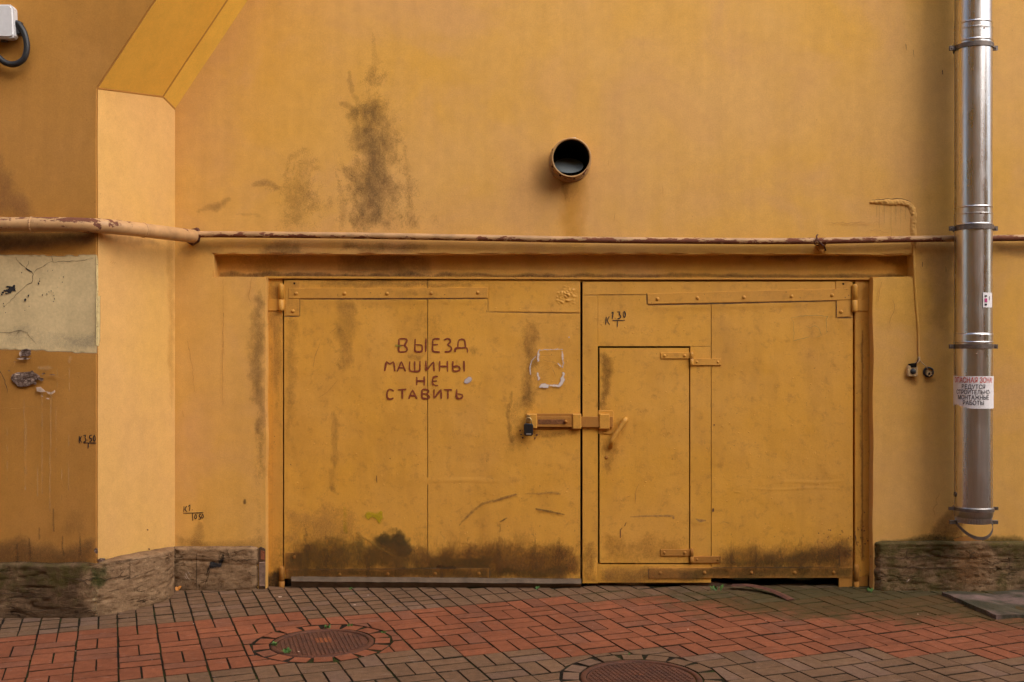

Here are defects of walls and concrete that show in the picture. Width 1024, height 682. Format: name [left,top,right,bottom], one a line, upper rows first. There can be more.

water stain [357,106,386,221]
crack [5,256,93,306]
flaking render [8,349,55,399]
water stain [353,532,412,559]